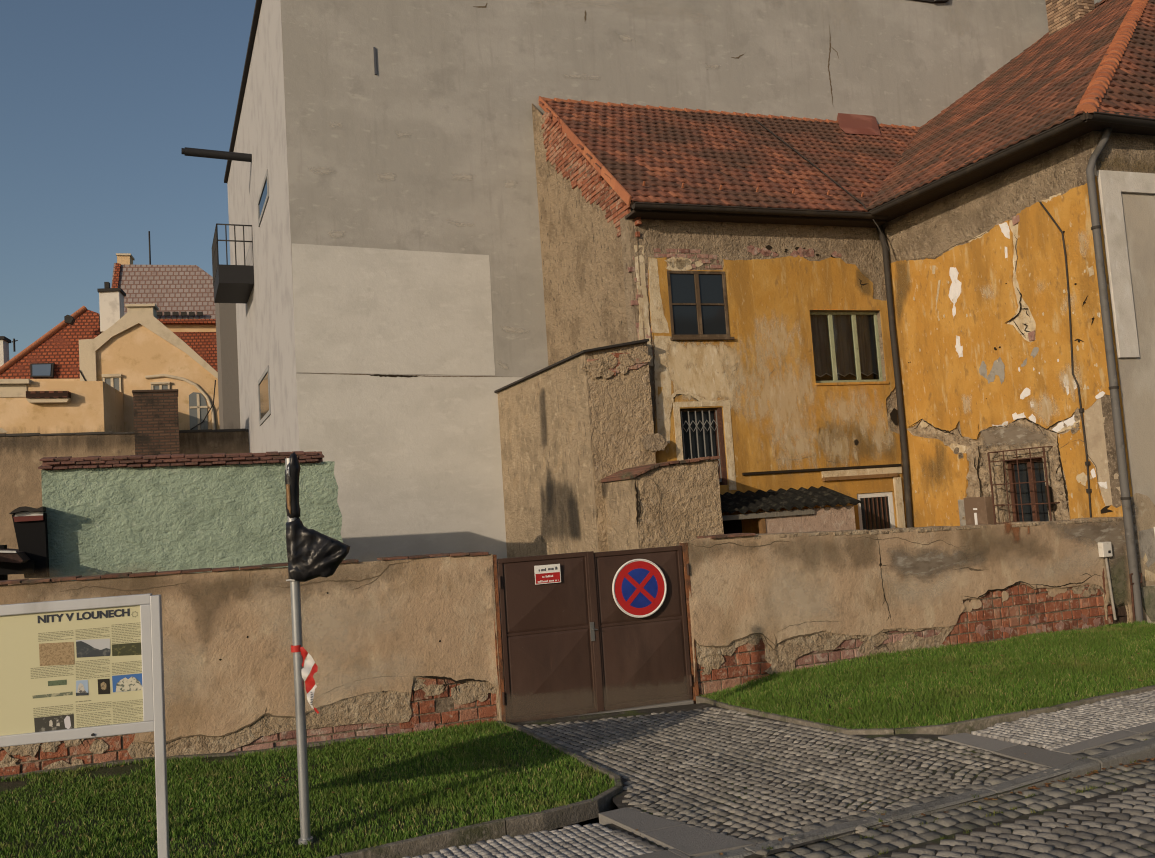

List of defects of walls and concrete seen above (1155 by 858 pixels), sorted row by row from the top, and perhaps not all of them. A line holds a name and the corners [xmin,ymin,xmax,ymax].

crack [828,24,839,104]
flaking render [541,112,1105,451]
flaking render [907,388,1107,523]
crack [858,536,1103,619]
flaking render [1131,493,1155,586]
flaking render [688,582,1130,700]
flaking render [0,677,506,776]